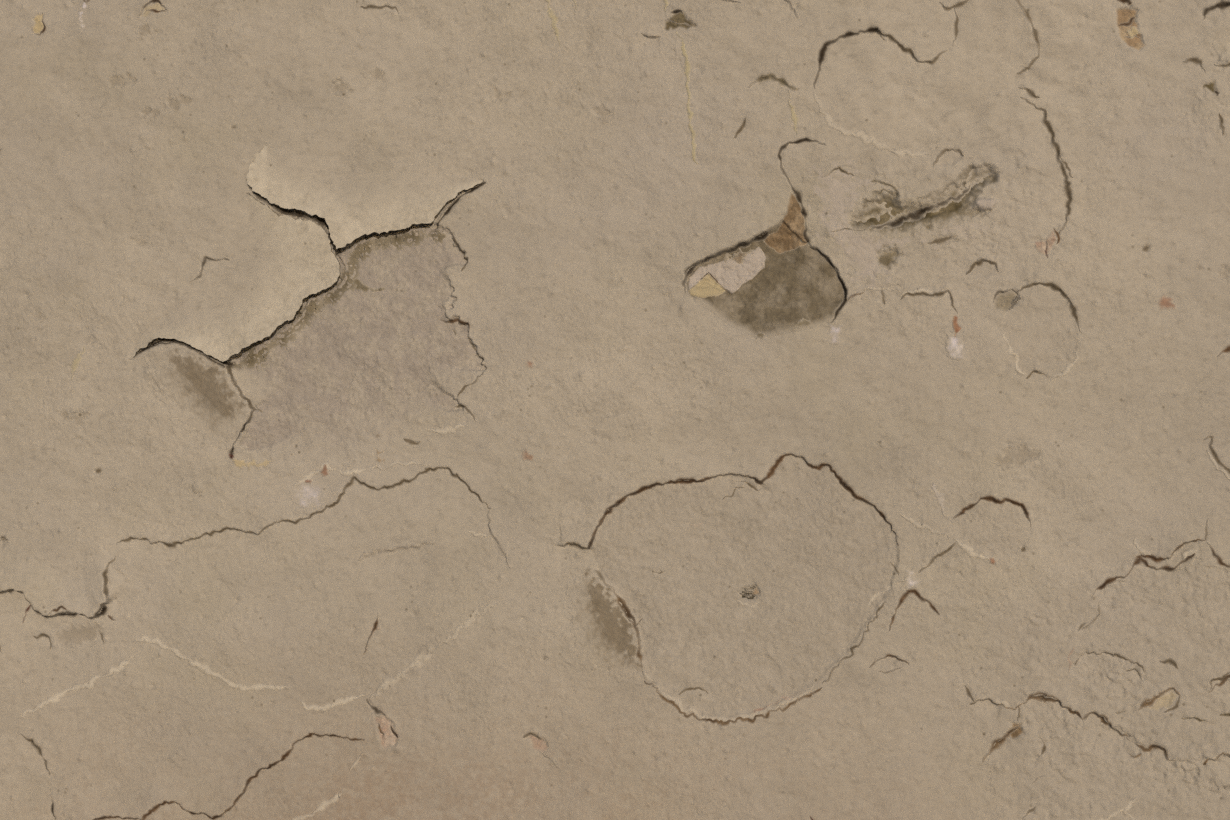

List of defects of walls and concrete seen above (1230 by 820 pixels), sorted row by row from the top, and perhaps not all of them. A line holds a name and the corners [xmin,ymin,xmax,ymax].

flaking render [131,145,487,478]
crack [822,166,854,177]
peeling [681,136,1011,340]
crack [813,0,969,88]
crack [864,286,958,314]
crack [1014,0,1074,234]
crack [0,466,512,655]
crack [965,519,1230,819]
crack [20,733,56,820]
crack [92,732,365,820]